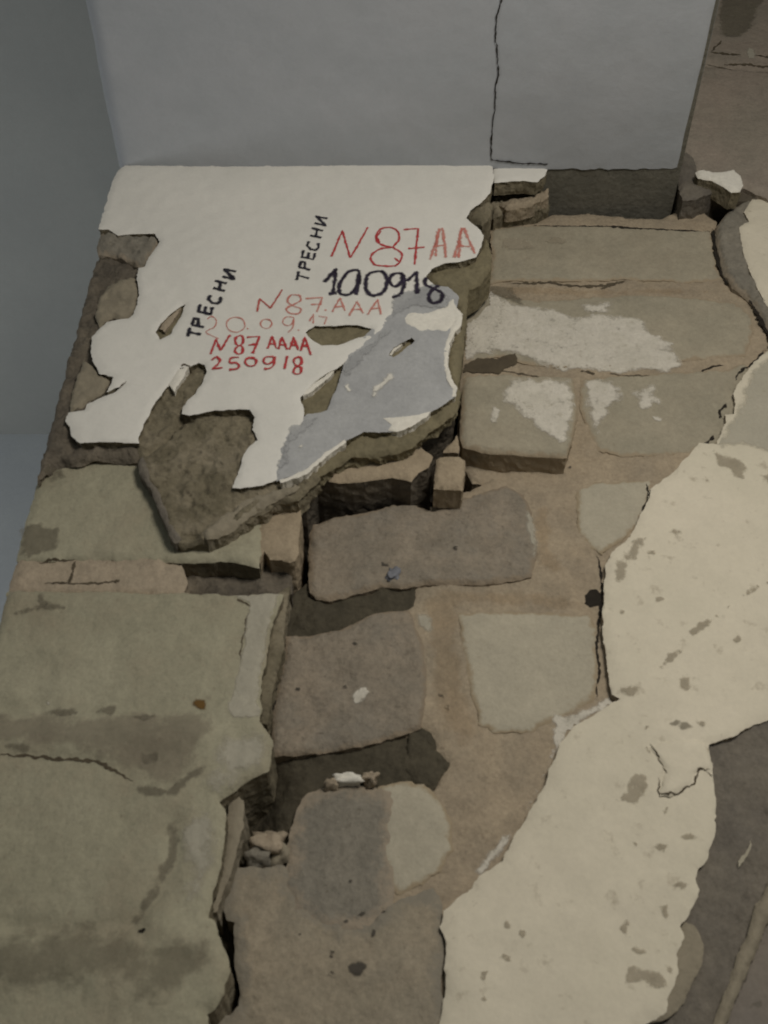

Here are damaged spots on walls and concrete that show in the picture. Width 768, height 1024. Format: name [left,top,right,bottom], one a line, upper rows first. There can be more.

crack [490,0,548,165]
peeling [37,188,550,552]
crack [41,557,120,585]
hole [585,589,602,607]
crack [595,557,605,696]
crack [0,753,133,781]
crack [650,744,707,796]
flaking render [648,721,768,1024]